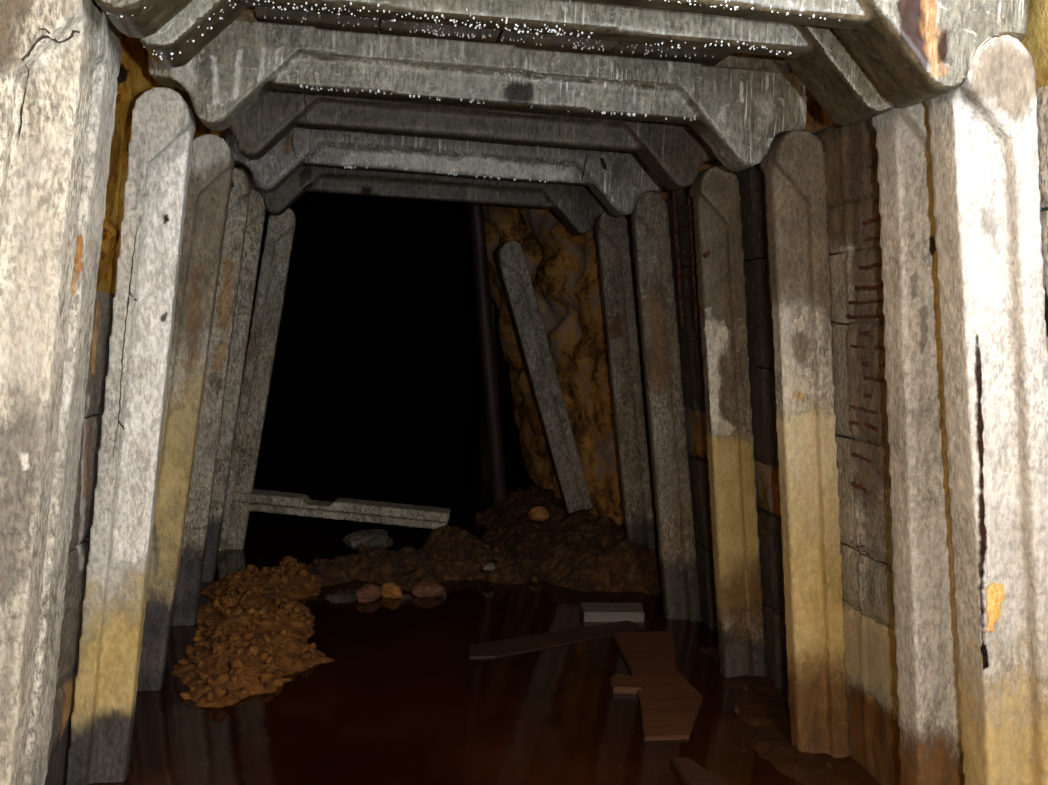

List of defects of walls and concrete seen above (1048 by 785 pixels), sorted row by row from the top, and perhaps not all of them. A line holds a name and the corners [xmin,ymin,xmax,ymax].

crack [17,28,80,146]
corrosion [898,0,948,68]
water stain [95,0,1036,319]